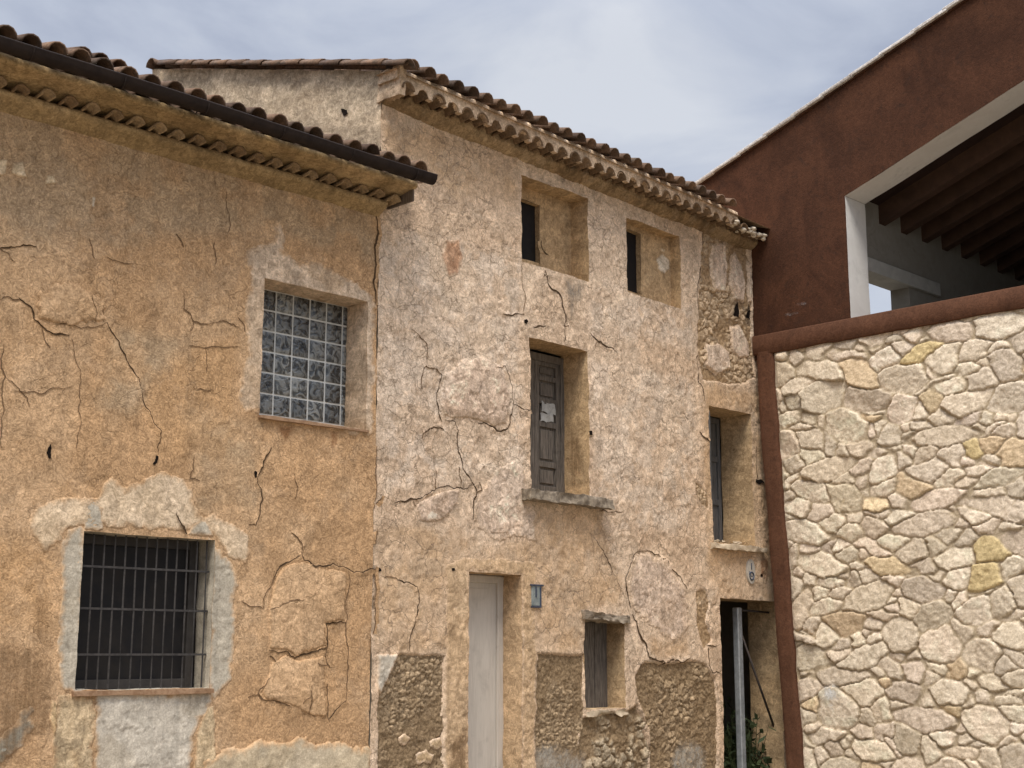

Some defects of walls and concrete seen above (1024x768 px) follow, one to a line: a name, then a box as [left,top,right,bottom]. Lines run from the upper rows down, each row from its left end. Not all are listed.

crack [0,239,37,261]
crack [0,294,162,452]
crack [184,299,245,391]
crack [373,216,382,305]
crack [503,240,618,357]
spalling [697,220,768,384]
crack [244,332,532,722]
crack [593,510,721,677]
spalling [377,654,444,768]
spalling [534,654,717,768]